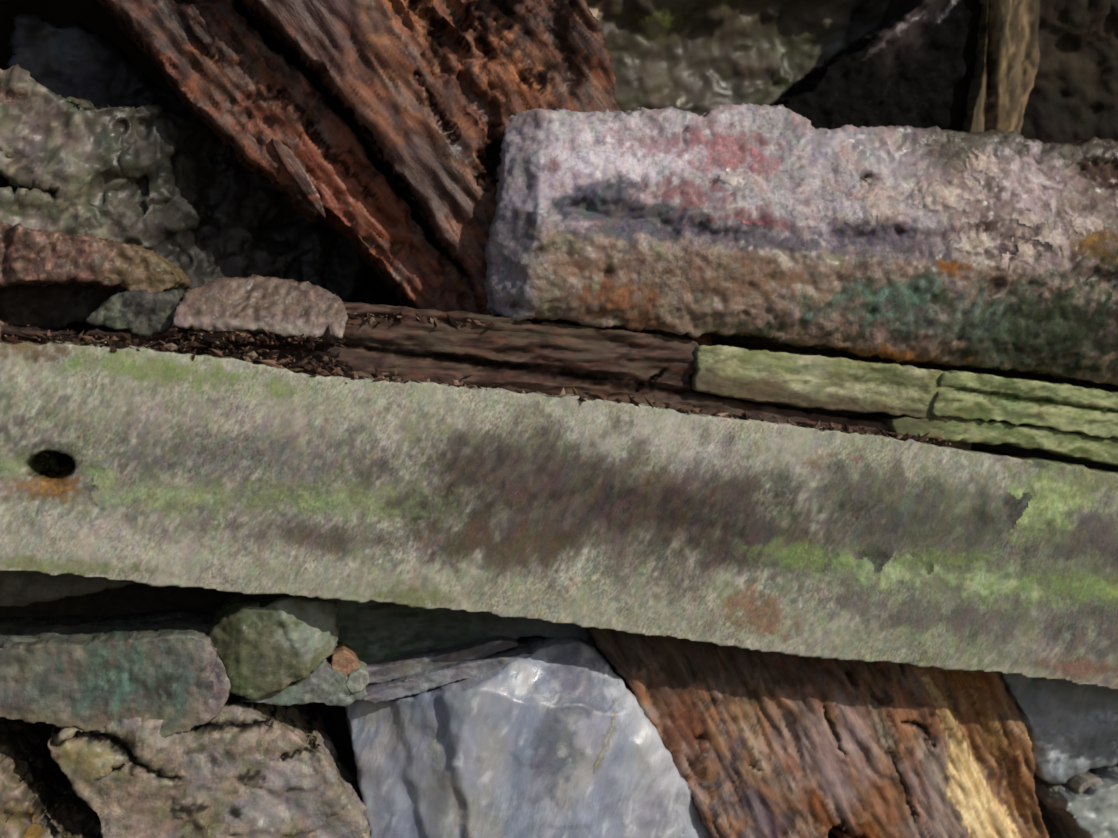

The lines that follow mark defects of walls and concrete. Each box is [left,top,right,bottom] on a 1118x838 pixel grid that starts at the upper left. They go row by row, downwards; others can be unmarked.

corrosion [19,468,80,501]